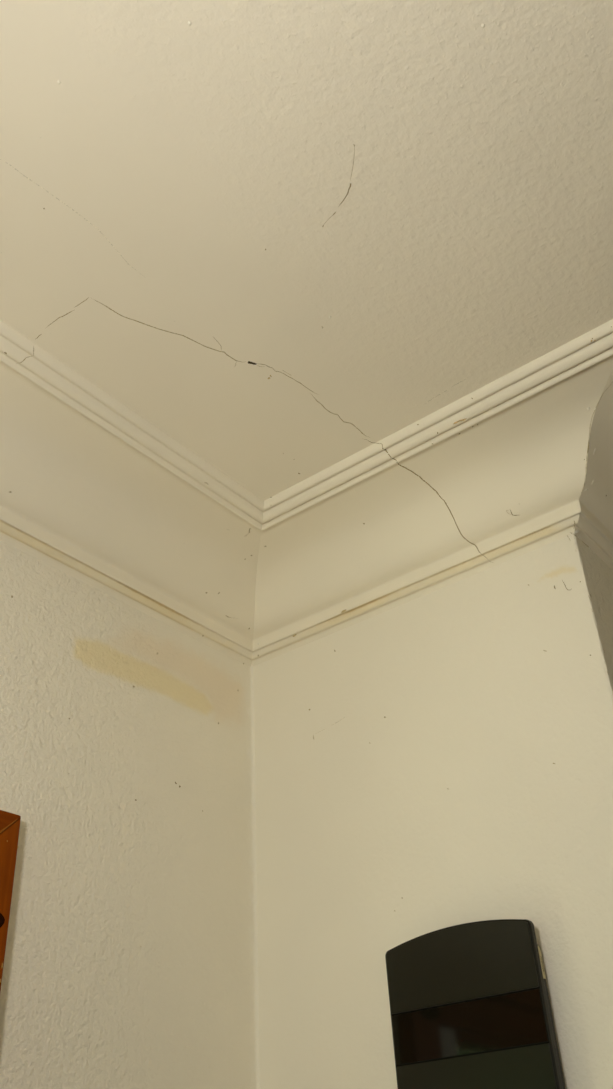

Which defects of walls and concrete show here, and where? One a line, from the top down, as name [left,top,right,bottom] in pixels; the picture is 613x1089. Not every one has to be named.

crack [322,144,355,227]
crack [16,297,493,563]